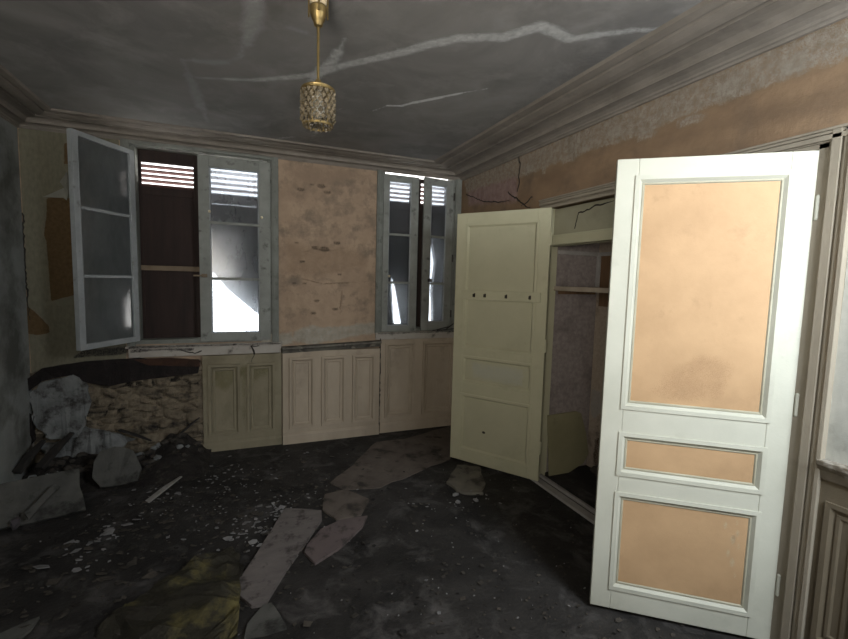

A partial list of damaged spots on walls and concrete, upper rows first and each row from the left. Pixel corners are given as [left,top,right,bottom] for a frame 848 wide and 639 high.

crack [206,20,655,83]
crack [375,91,471,110]
crack [466,157,532,208]
peeling [43,143,74,306]
crack [574,200,614,229]
spalling [27,358,203,463]